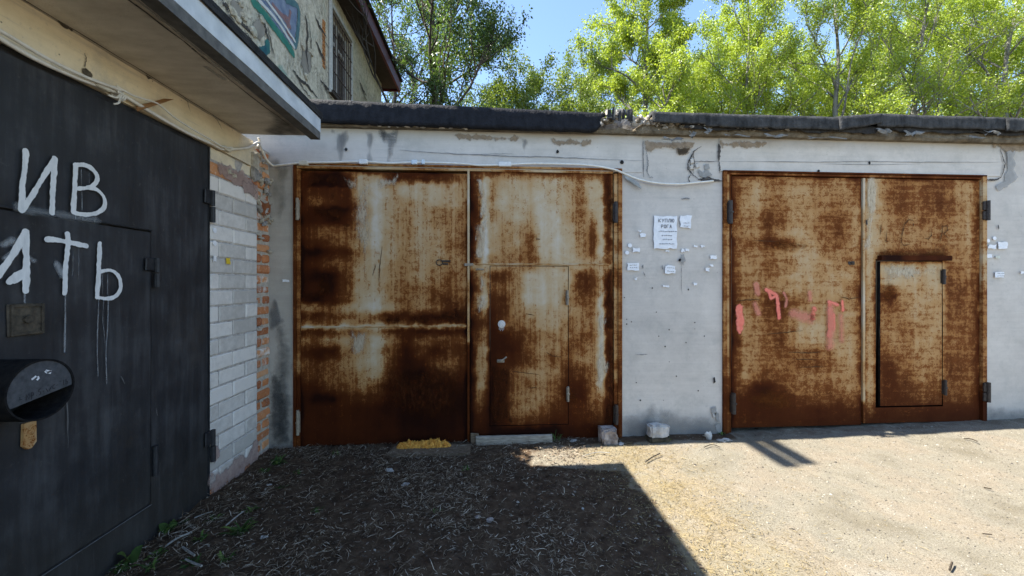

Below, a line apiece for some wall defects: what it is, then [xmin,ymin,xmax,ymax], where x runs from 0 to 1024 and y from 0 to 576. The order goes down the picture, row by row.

peeling [229,0,266,41]
peeling [301,19,326,81]
water stain [368,130,397,147]
spalling [218,149,274,253]
water stain [271,301,280,328]
water stain [273,364,288,443]
corrosion [606,347,614,425]